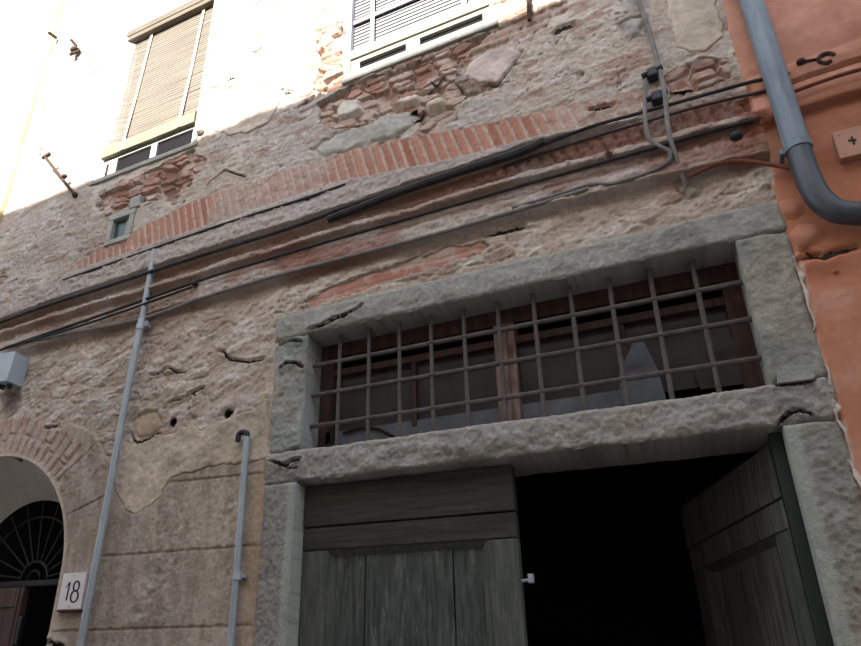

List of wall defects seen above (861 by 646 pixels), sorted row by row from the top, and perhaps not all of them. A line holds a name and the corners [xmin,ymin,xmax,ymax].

flaking render [312,21,522,135]
flaking render [100,152,207,217]
crack [801,248,857,260]
peeling [792,255,816,332]
crack [222,306,362,369]
crack [780,379,810,387]
spalling [777,364,816,387]
crack [780,409,811,423]
peeling [824,364,861,487]
crack [271,459,300,469]